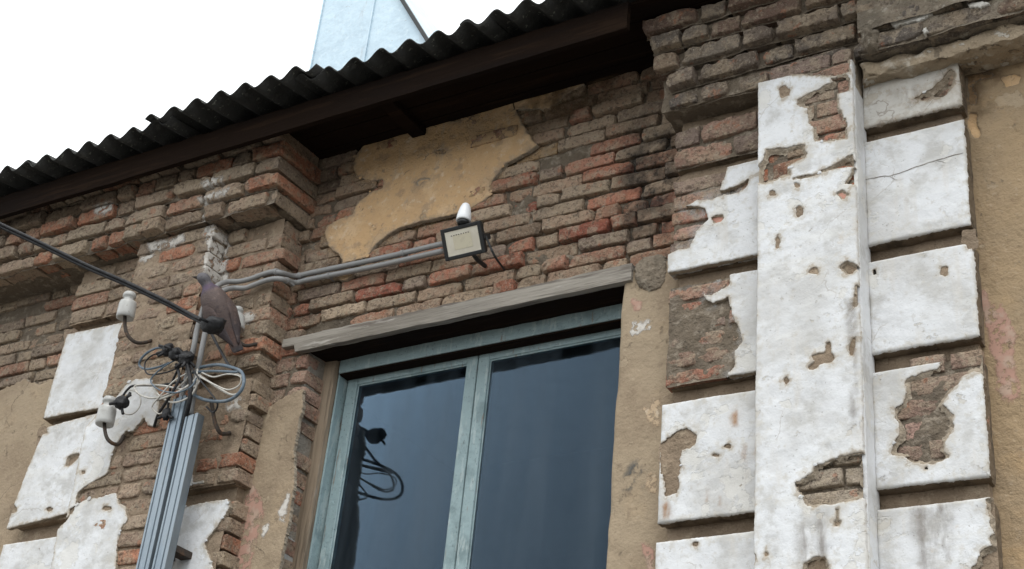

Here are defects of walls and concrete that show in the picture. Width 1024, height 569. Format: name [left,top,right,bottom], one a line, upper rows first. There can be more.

flaking render [915,70,964,101]
flaking render [759,49,855,199]
flaking render [324,76,610,282]
crack [866,153,962,180]
peeling [808,342,834,370]
flaking render [891,290,1020,469]
flaking render [50,378,162,569]
peeling [645,429,697,496]
flaking render [796,452,864,526]